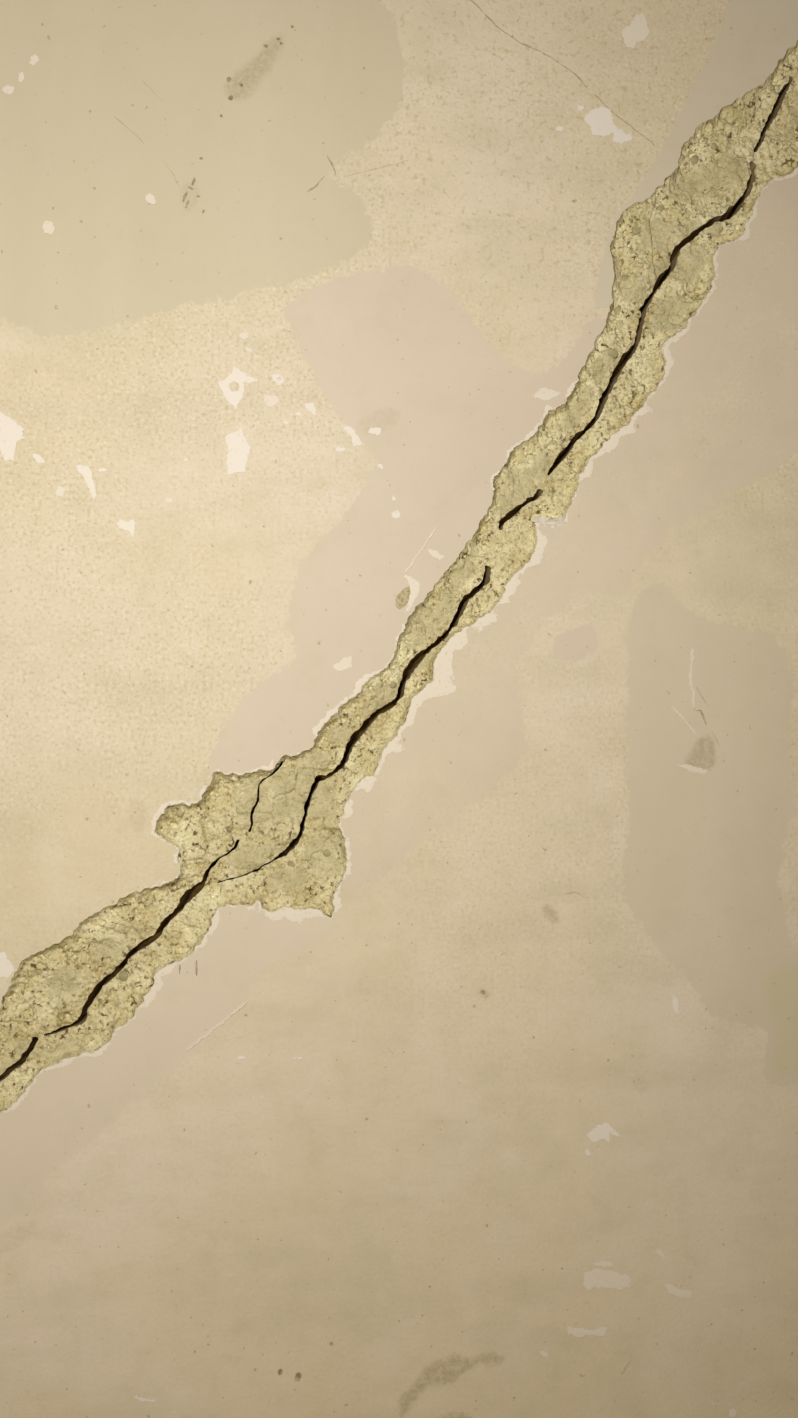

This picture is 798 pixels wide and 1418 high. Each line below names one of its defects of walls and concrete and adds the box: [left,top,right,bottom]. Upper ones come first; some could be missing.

peeling [621,13,650,48]
crack [498,76,793,530]
flaking render [0,40,798,1113]
crack [0,565,491,1082]
peeling [585,1122,620,1156]